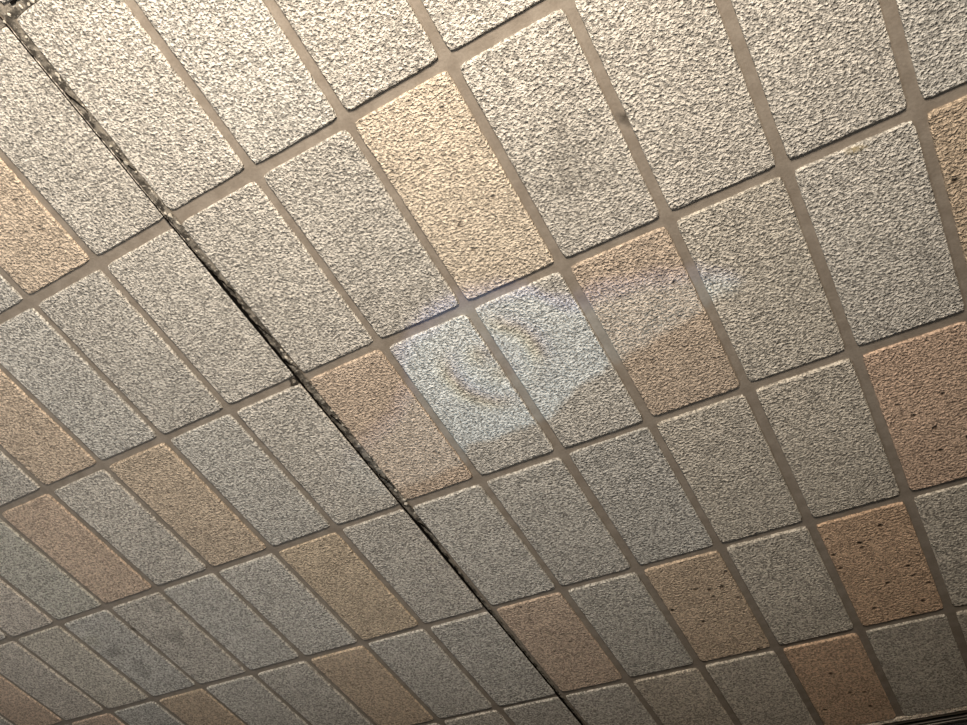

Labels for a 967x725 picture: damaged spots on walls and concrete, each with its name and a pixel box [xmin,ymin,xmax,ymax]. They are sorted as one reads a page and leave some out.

crack [0,0,583,725]